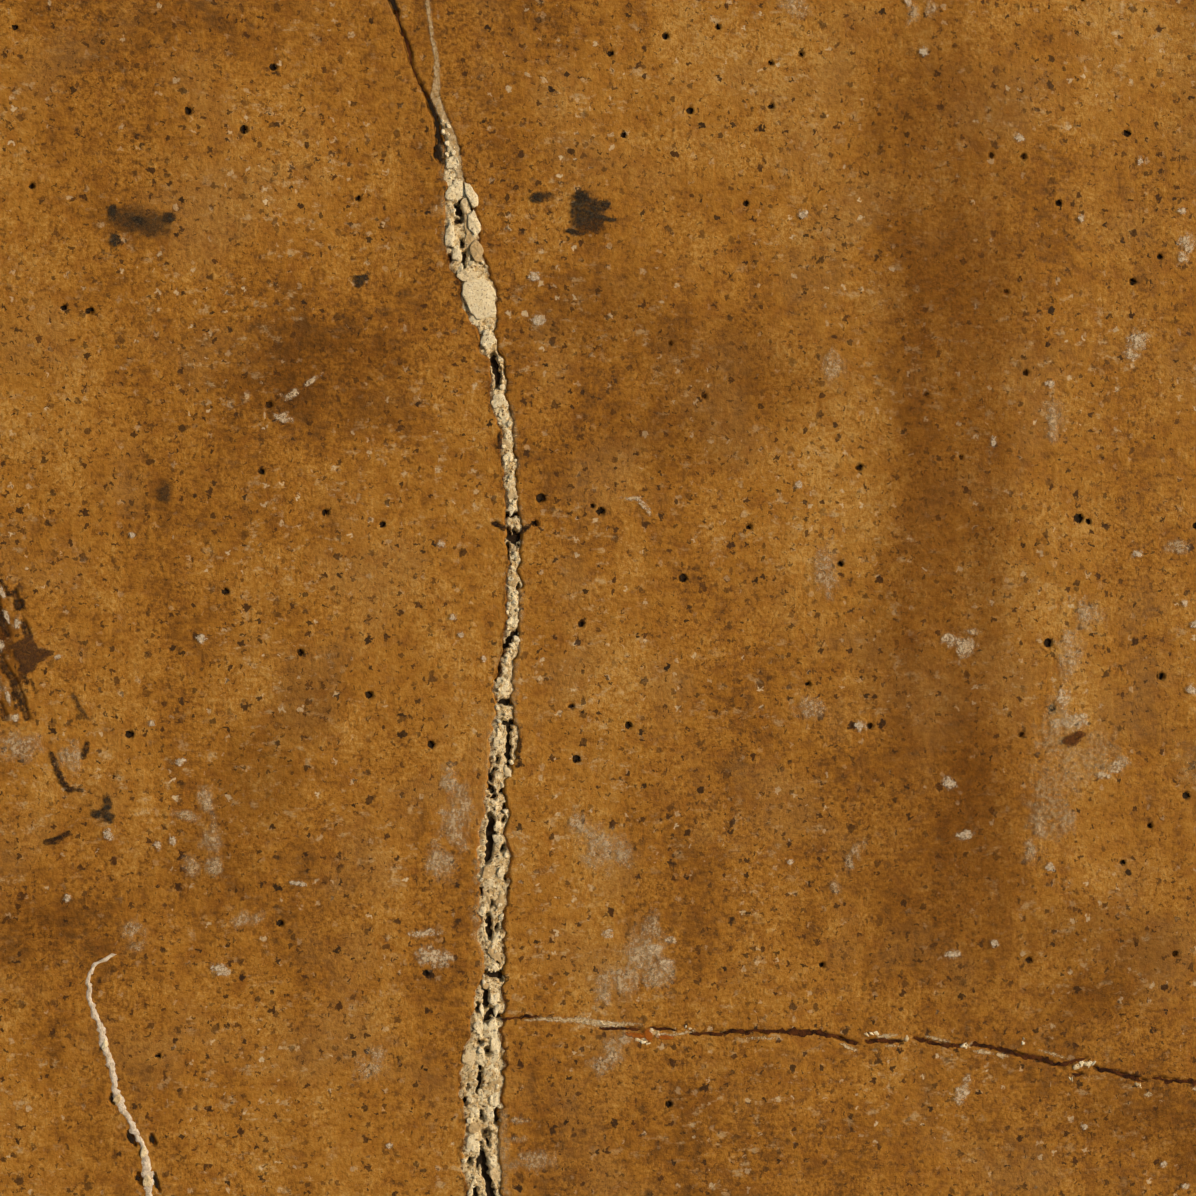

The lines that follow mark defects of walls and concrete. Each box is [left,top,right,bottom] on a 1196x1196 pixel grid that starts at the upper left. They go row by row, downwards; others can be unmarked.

damp [108,204,176,246]
damp [567,190,617,235]
crack [389,0,1196,1196]
damp [91,798,115,823]
crack [85,953,159,1196]